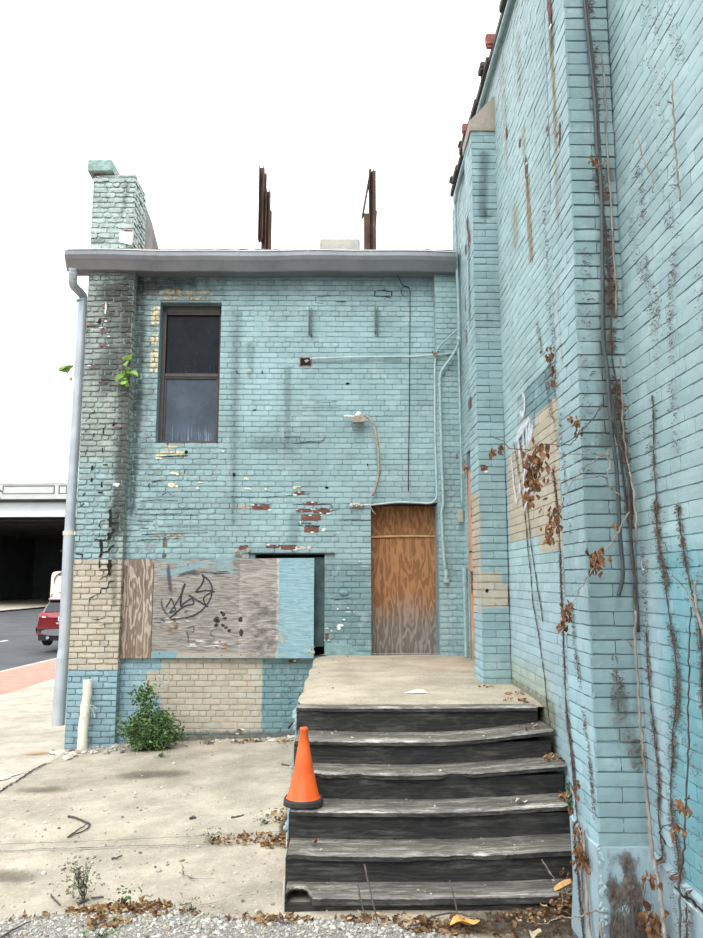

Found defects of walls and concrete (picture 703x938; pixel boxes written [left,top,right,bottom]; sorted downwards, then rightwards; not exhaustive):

corrosion [549,24,557,144]
spalling [85,302,114,347]
peeling [156,446,188,459]
spalling [293,486,330,533]
damp [607,852,646,938]